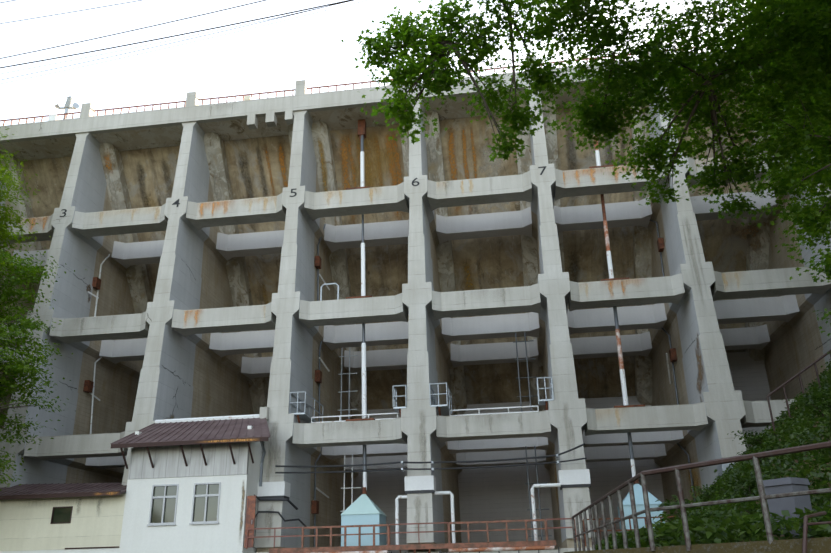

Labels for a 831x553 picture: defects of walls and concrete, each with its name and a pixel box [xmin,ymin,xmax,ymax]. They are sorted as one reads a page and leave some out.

damp [258,144,288,194]
damp [340,134,409,190]
damp [448,130,500,180]